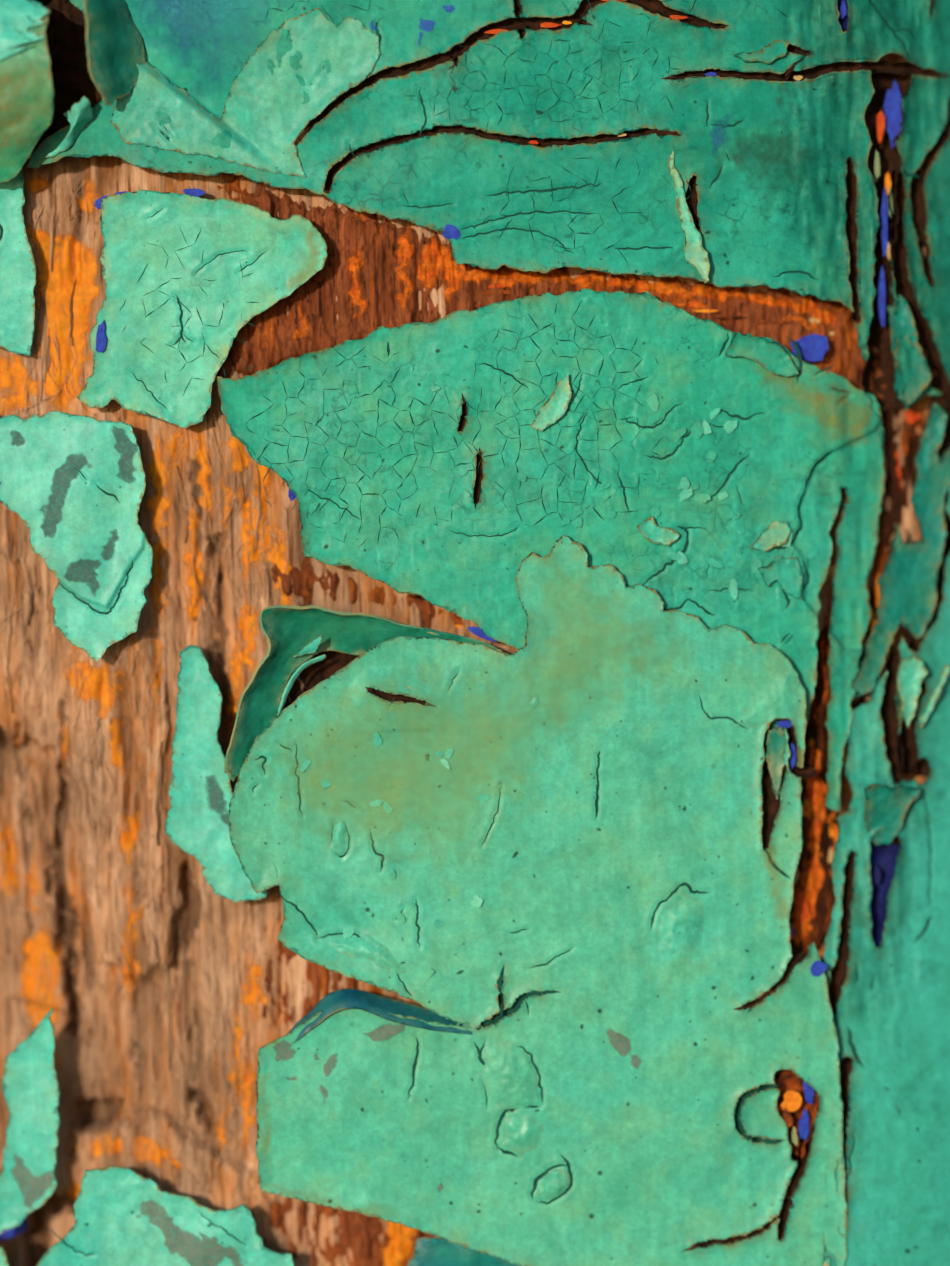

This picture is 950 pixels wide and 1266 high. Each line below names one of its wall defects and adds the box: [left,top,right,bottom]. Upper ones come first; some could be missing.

crack [191,0,950,416]
crack [119,209,767,545]
peeling [0,147,950,728]
crack [642,452,832,643]
peeling [0,1008,60,1266]
peeling [36,1165,518,1266]
peeling [165,552,510,932]
peeling [262,940,481,1050]
crack [593,751,601,819]
crack [651,882,710,928]
peeling [760,597,849,977]
crack [682,651,932,1252]